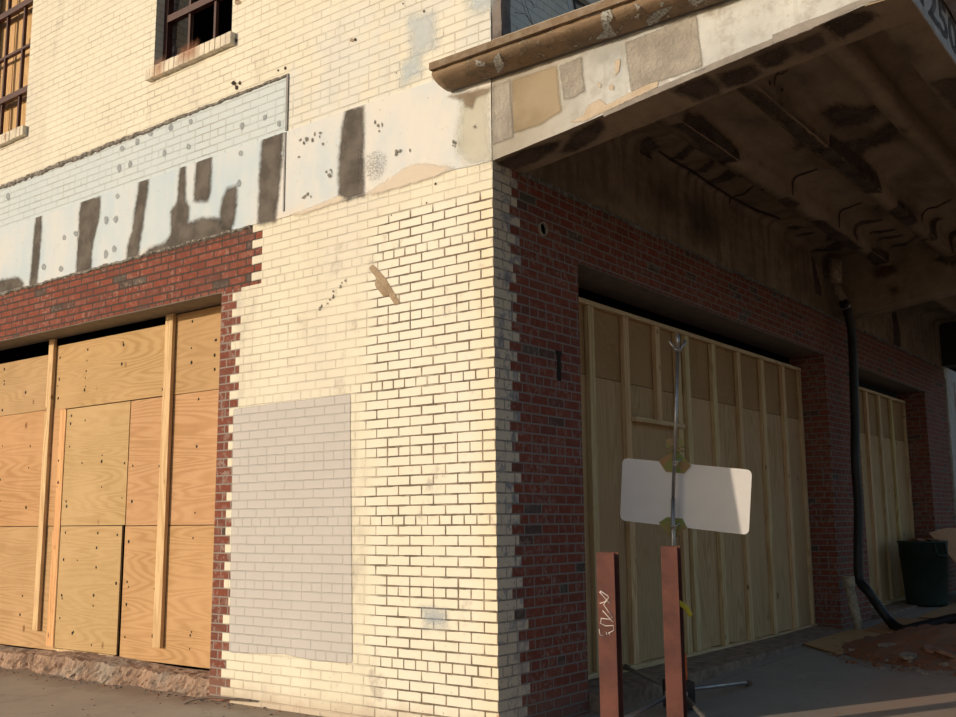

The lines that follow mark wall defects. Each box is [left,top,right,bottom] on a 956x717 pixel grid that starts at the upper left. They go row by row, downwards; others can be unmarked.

peeling [475,53,504,73]
peeling [571,0,877,122]
peeling [512,66,561,132]